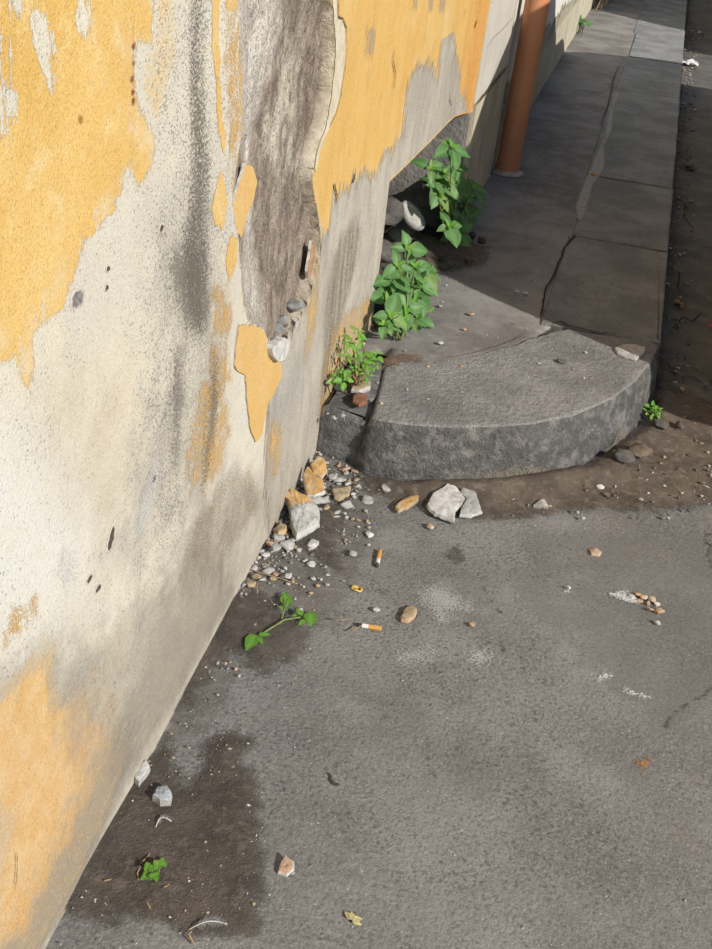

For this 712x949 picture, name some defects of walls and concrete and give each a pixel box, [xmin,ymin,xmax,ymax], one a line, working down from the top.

crack [601,62,621,124]
peeling [0,0,469,894]
peeling [37,909,66,949]
leakage [64,731,269,937]